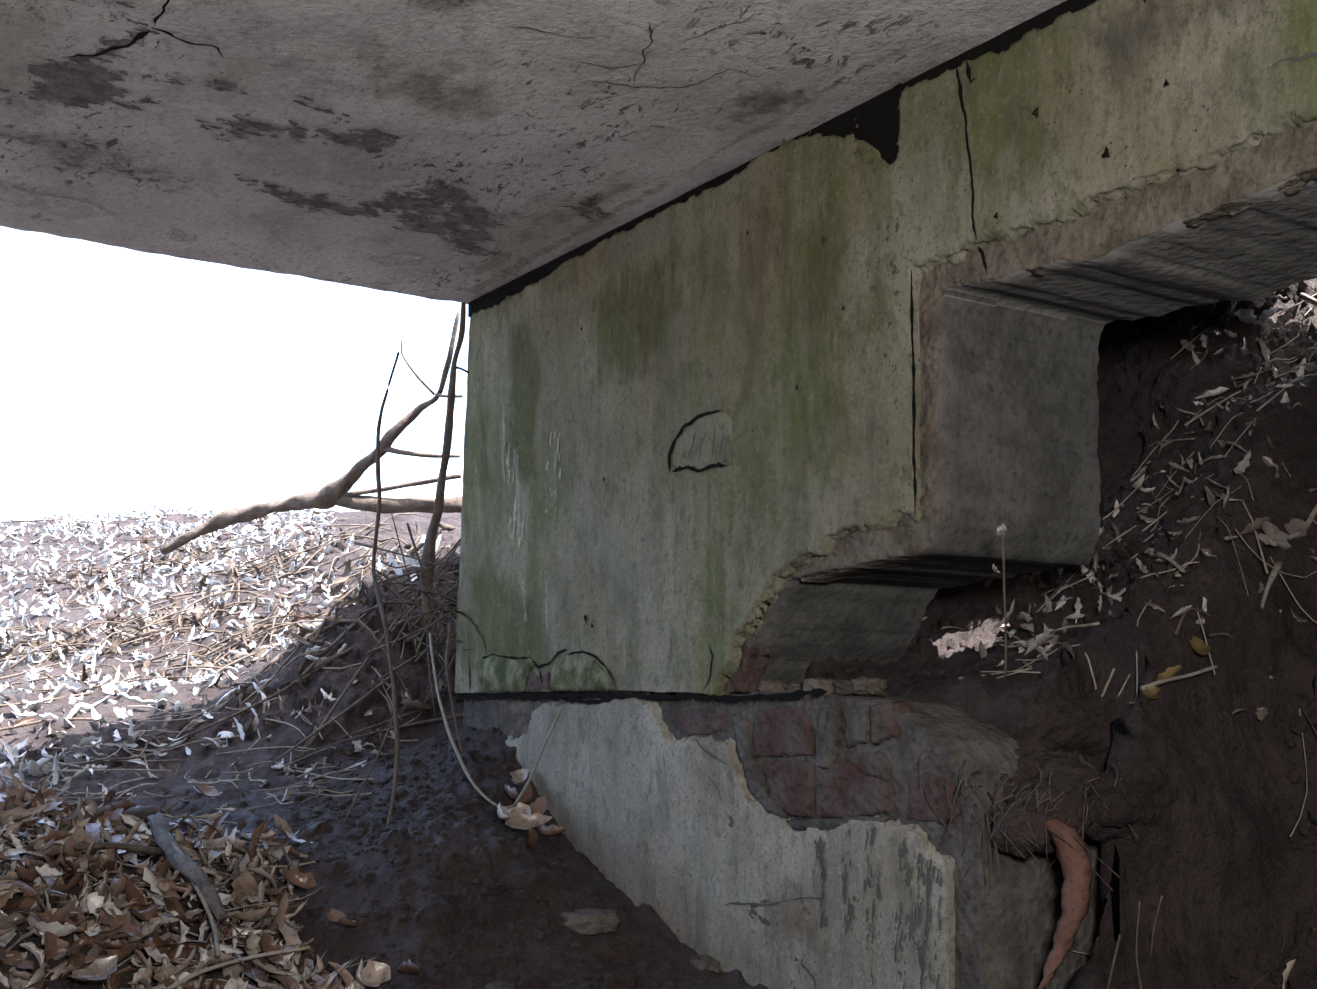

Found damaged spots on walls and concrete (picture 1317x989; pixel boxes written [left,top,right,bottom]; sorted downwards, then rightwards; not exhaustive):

crack [62,0,223,58]
crack [468,0,1097,317]
spalling [851,82,902,196]
spalling [1269,158,1317,195]
spalling [1183,178,1255,227]
spalling [800,557,925,583]
flaking render [723,644,772,694]
spalling [675,700,960,831]
flaking render [748,899,783,926]